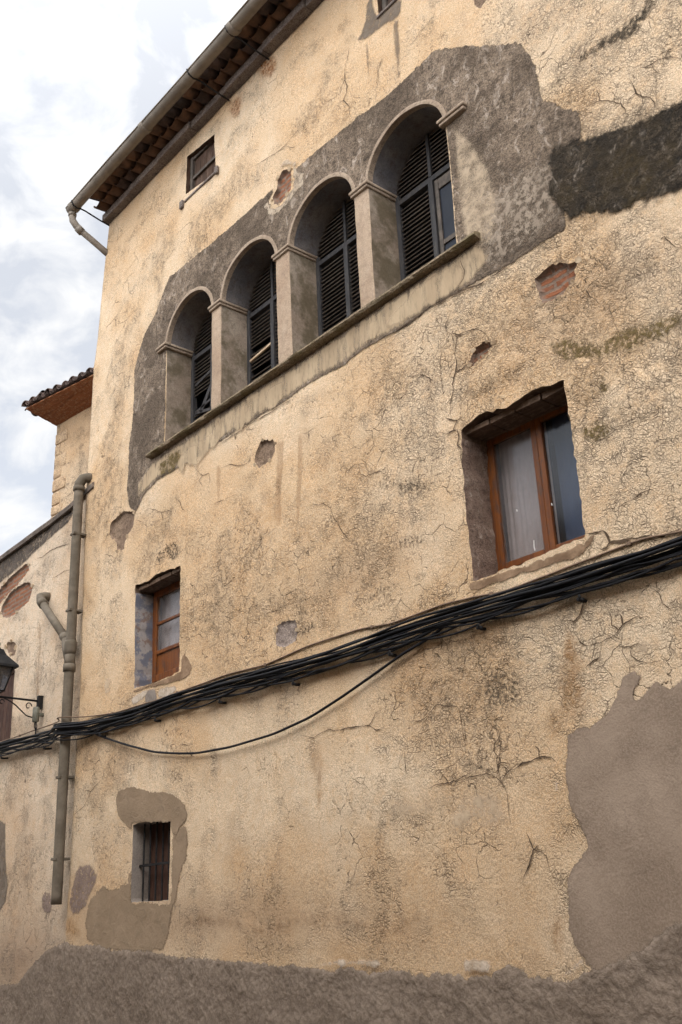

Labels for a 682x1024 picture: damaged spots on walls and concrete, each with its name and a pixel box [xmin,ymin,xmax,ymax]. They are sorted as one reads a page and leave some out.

crack [586,48,680,117]
spalling [264,160,304,216]
leakage [138,100,682,492]
spalling [531,256,582,307]
crack [378,252,527,467]
spalling [467,339,497,367]
spalling [253,439,277,468]
spalling [107,510,135,553]
crack [587,528,681,550]
spalling [0,563,34,618]
crack [566,590,678,667]
crack [429,716,556,879]